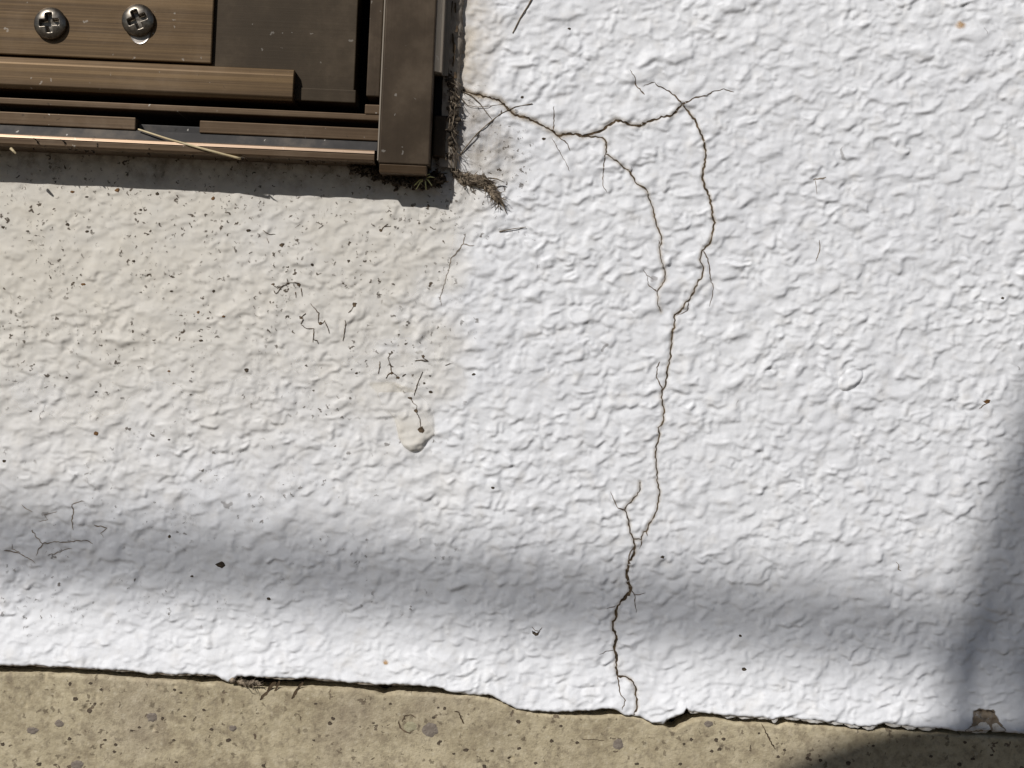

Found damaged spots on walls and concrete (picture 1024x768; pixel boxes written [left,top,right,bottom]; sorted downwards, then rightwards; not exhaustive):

crack [440,1,733,715]
spalling [965,708,1006,733]